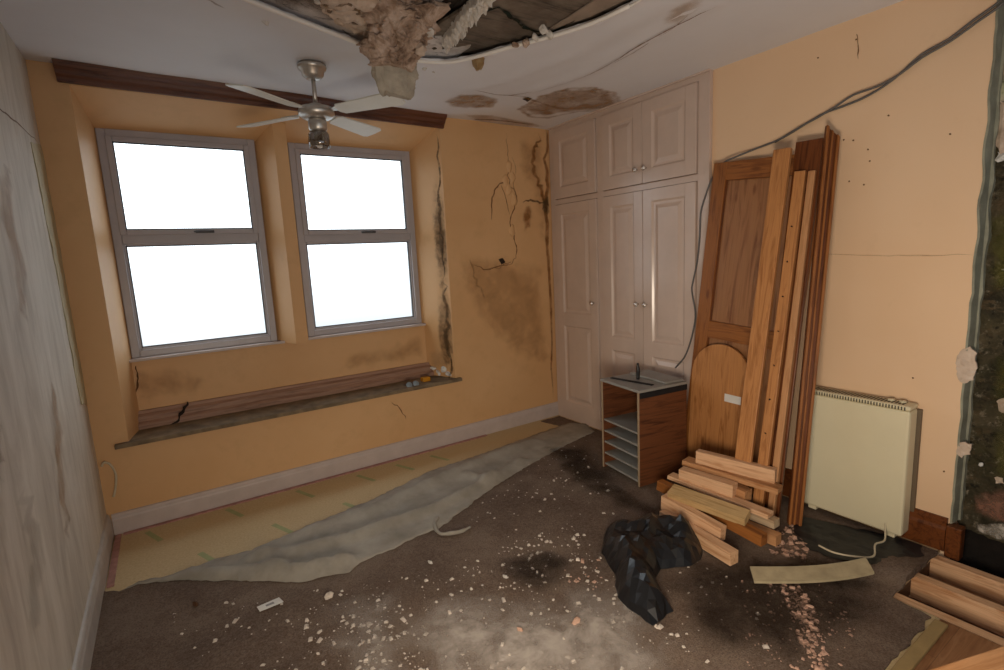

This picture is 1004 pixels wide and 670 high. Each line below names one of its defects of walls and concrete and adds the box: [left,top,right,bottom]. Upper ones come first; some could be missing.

spalling [314,0,382,35]
spalling [441,0,496,55]
leakage [435,142,447,272]
crack [478,146,517,270]
leakage [440,288,453,374]
crack [170,402,189,425]